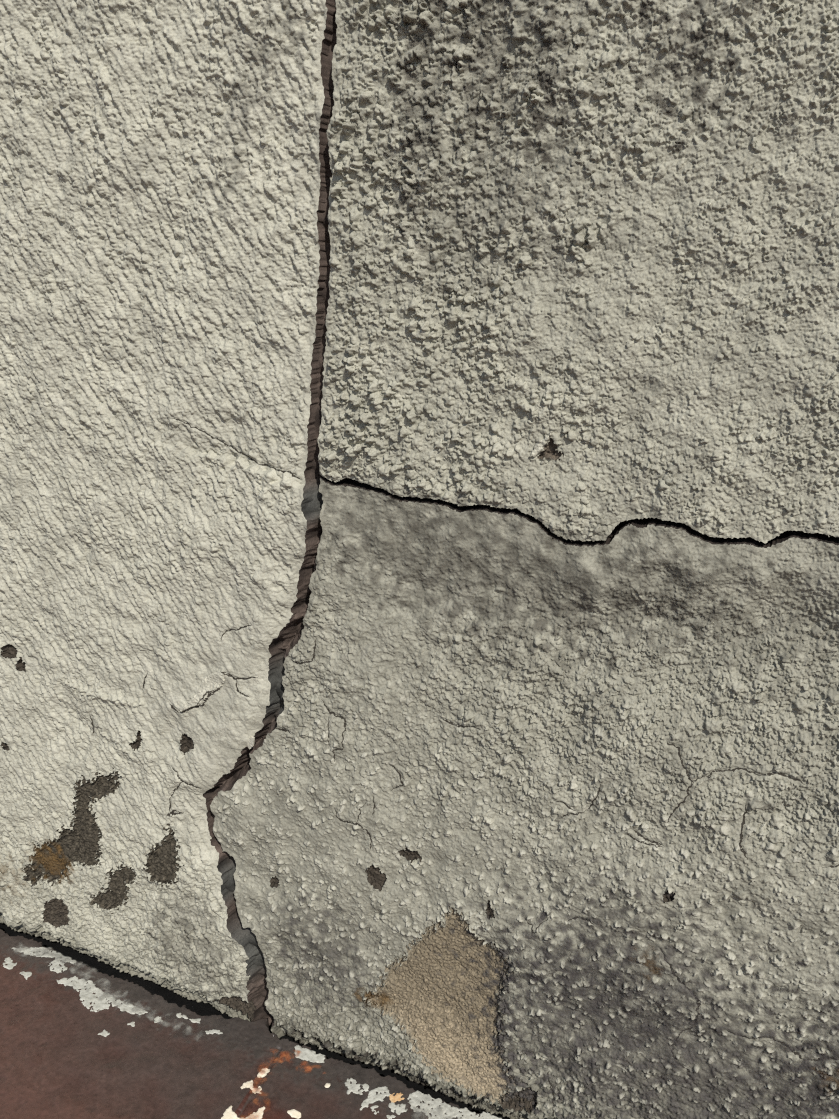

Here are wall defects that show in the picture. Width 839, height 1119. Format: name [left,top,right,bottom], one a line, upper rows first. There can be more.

crack [167,0,839,1028]
spalling [22,768,184,928]
spalling [345,906,538,1119]